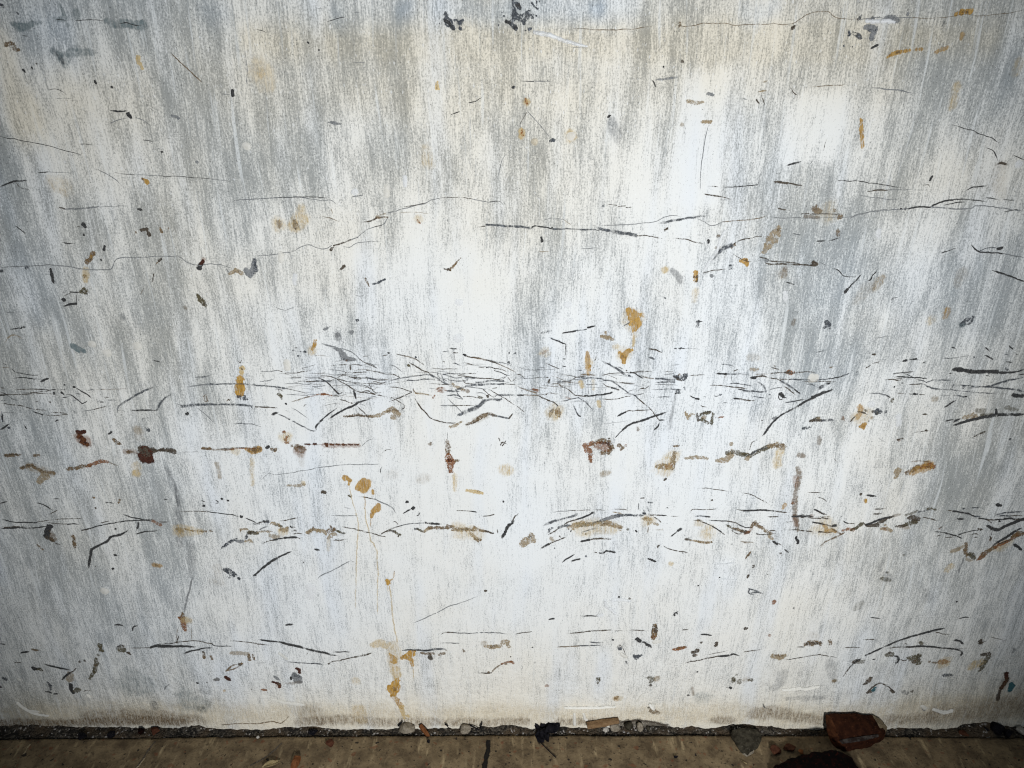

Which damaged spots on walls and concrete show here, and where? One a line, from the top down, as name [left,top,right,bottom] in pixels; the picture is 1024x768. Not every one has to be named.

leakage [57,5,147,31]
crack [254,125,1024,294]
rust [618,307,644,364]
crack [0,326,1024,475]
rust [112,438,176,476]
rust [445,433,458,480]
rust [582,438,627,463]
rust [342,475,381,527]
crack [0,497,348,577]
crack [116,624,371,665]
crack [404,599,652,660]
crack [673,601,1001,677]